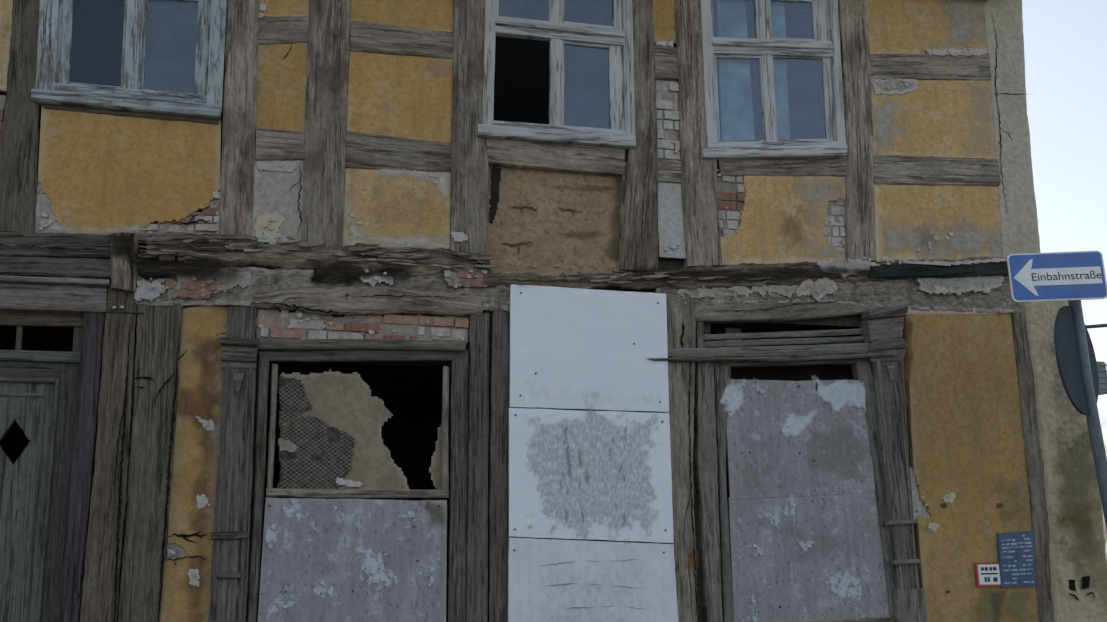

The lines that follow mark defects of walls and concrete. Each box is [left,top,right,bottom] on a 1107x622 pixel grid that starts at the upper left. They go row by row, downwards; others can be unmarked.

flaking render [655,79,680,161]
crack [992,18,1028,209]
spalling [35,182,71,233]
flaking render [106,184,251,302]
flaking render [717,169,746,237]
spalling [677,199,1006,302]
flaking render [256,309,469,344]
crack [166,531,207,561]